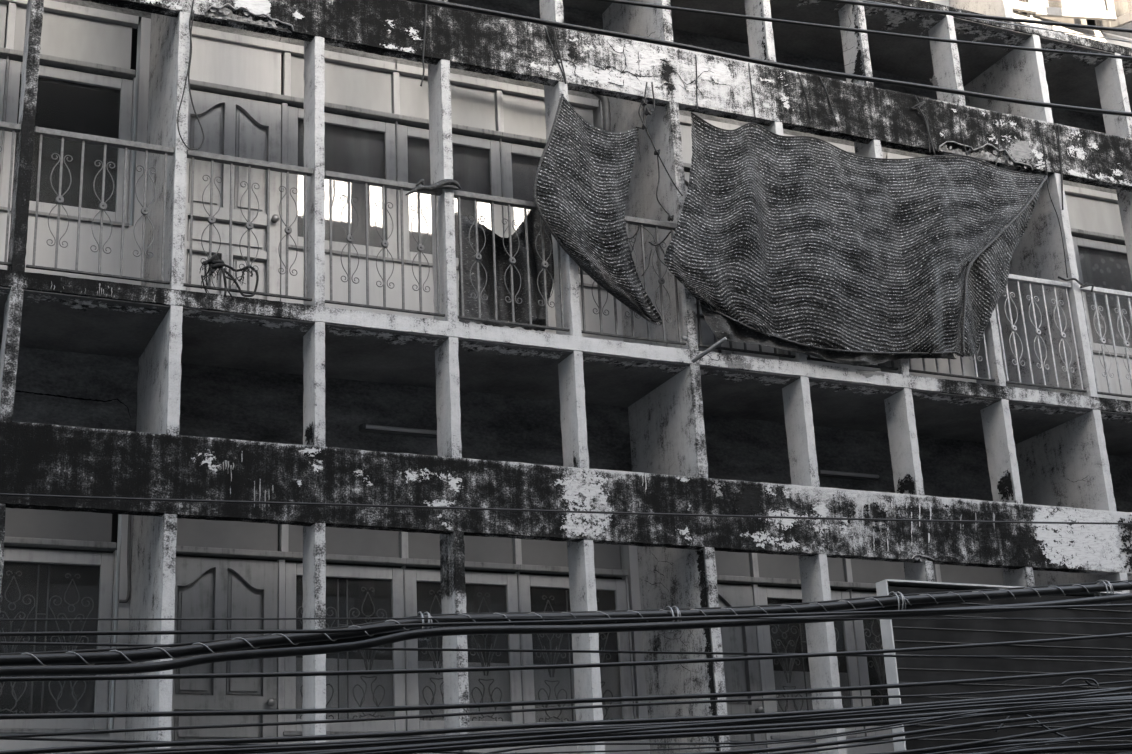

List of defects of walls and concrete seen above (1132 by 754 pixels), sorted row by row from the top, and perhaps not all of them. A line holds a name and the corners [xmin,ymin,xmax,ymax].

leakage [851,5,864,83]
leakage [658,58,676,98]
leakage [305,422,313,446]
leakage [732,483,762,516]
leakage [833,469,1044,565]
peeling [1031,506,1126,571]
leakage [1117,514,1132,571]
leakage [695,549,708,608]
leakage [703,628,716,716]